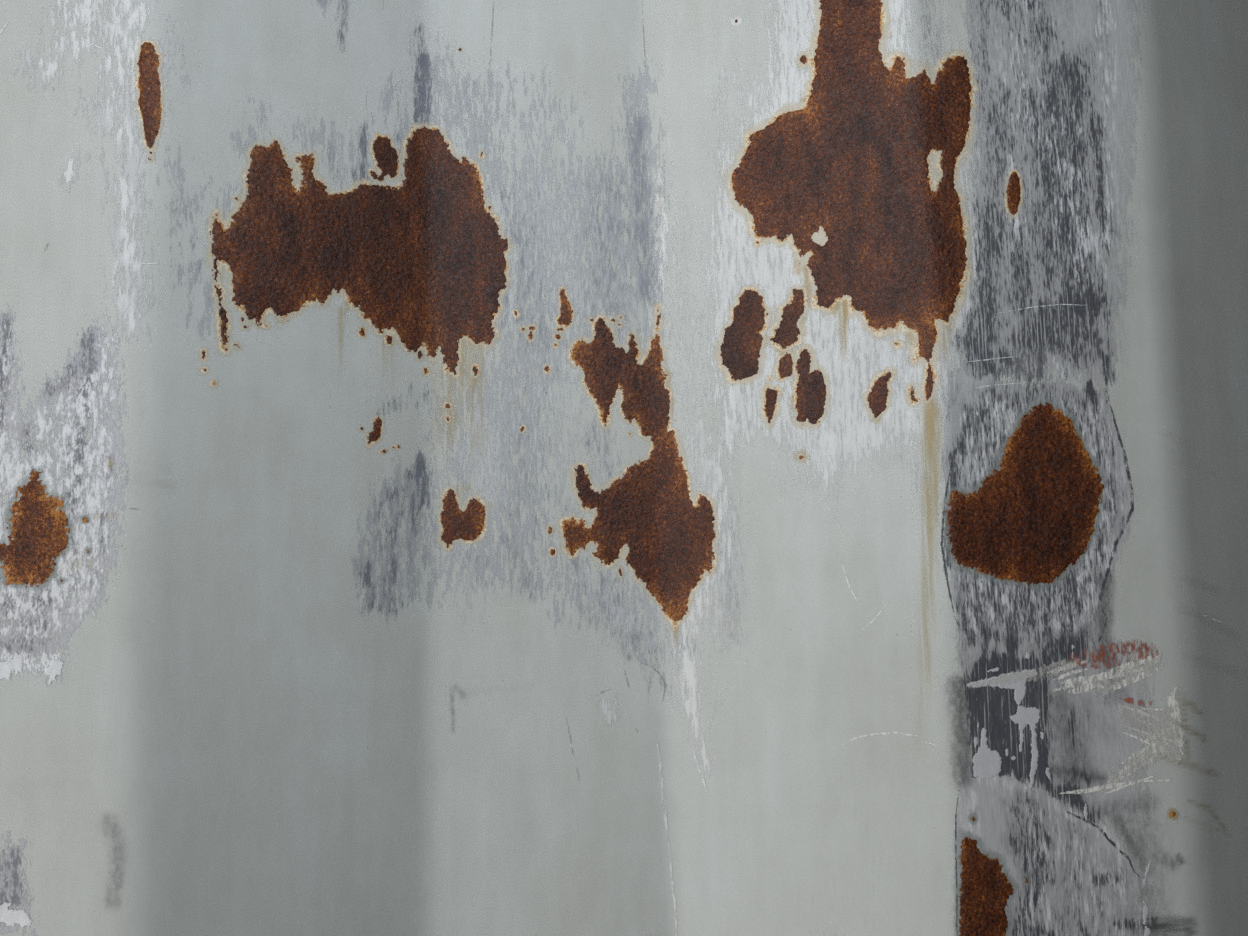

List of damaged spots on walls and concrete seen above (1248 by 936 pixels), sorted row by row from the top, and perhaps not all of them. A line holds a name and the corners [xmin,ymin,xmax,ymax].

rust [134,40,165,162]
peeling [293,26,506,203]
peeling [0,0,242,686]
rust [199,123,538,424]
rust [715,0,979,451]
rust [0,469,90,587]
peeling [352,452,435,616]
rust [437,486,490,552]
rust [546,286,719,636]
peeling [652,0,1157,936]
rust [926,400,1105,589]
rust [955,814,1029,936]